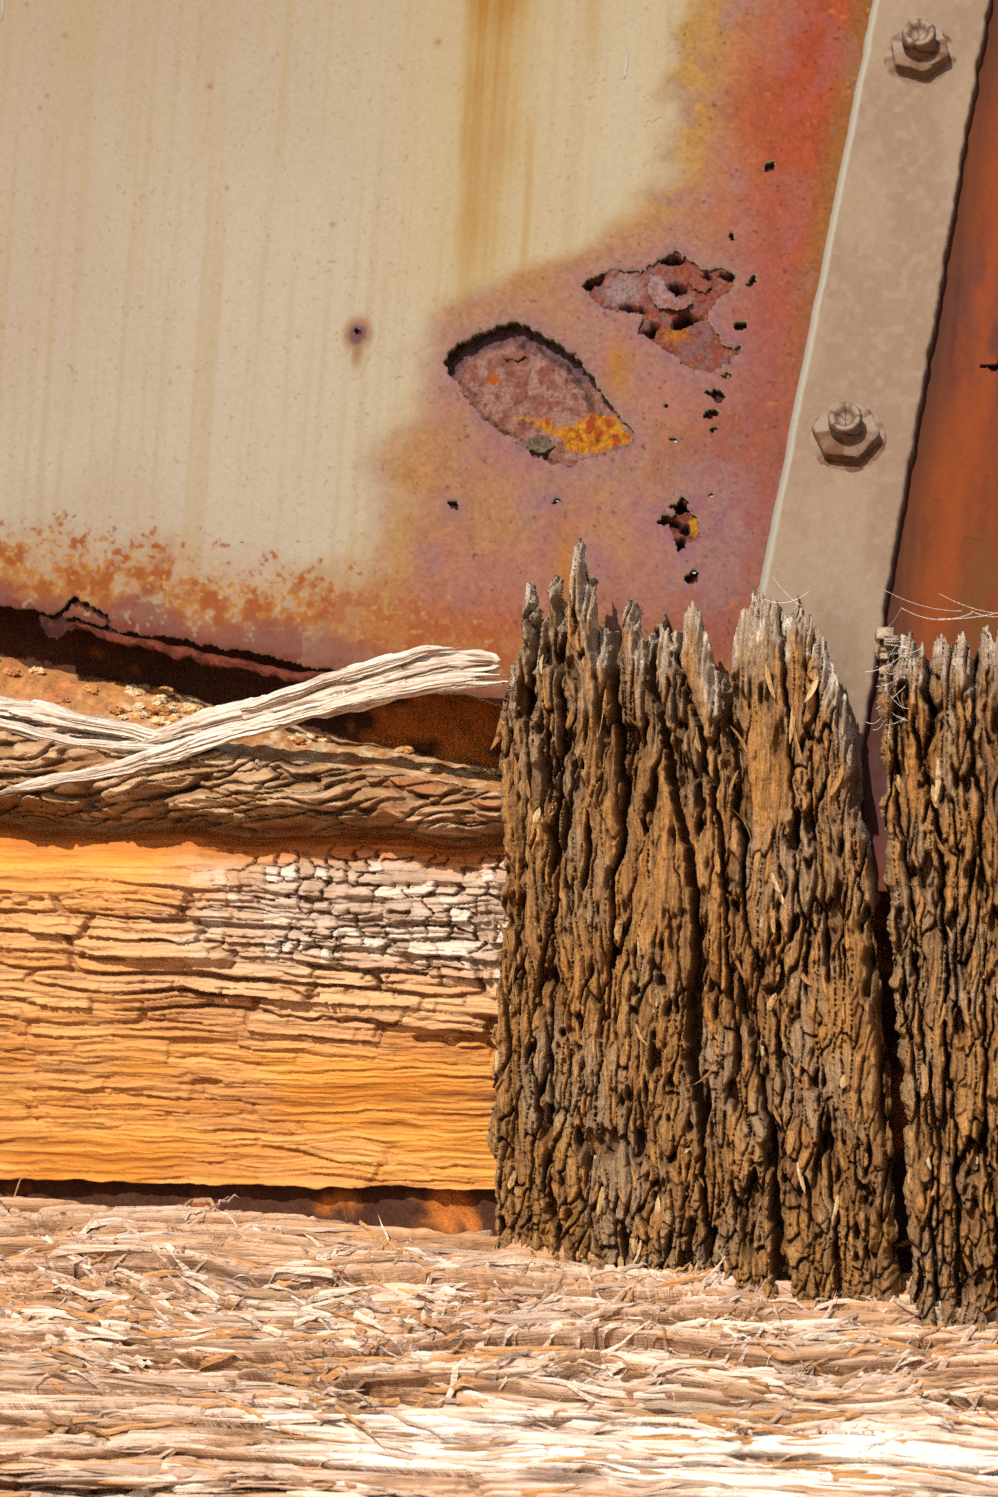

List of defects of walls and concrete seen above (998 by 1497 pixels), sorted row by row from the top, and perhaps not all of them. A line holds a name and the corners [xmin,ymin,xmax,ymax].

rust [0,0,873,705]
peeling [647,269,712,311]
rust [903,105,998,663]